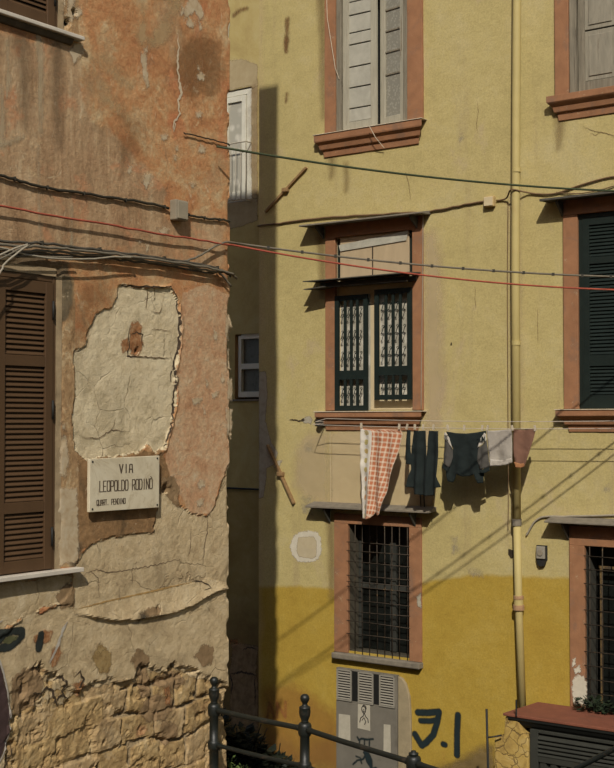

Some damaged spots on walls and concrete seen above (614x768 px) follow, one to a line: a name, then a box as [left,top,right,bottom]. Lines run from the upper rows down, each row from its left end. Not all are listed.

peeling [181,0,204,30]
crack [173,33,183,131]
peeling [59,283,183,477]
crack [119,284,182,446]
peeling [192,314,232,414]
peeling [0,461,230,768]
peeling [571,658,587,705]